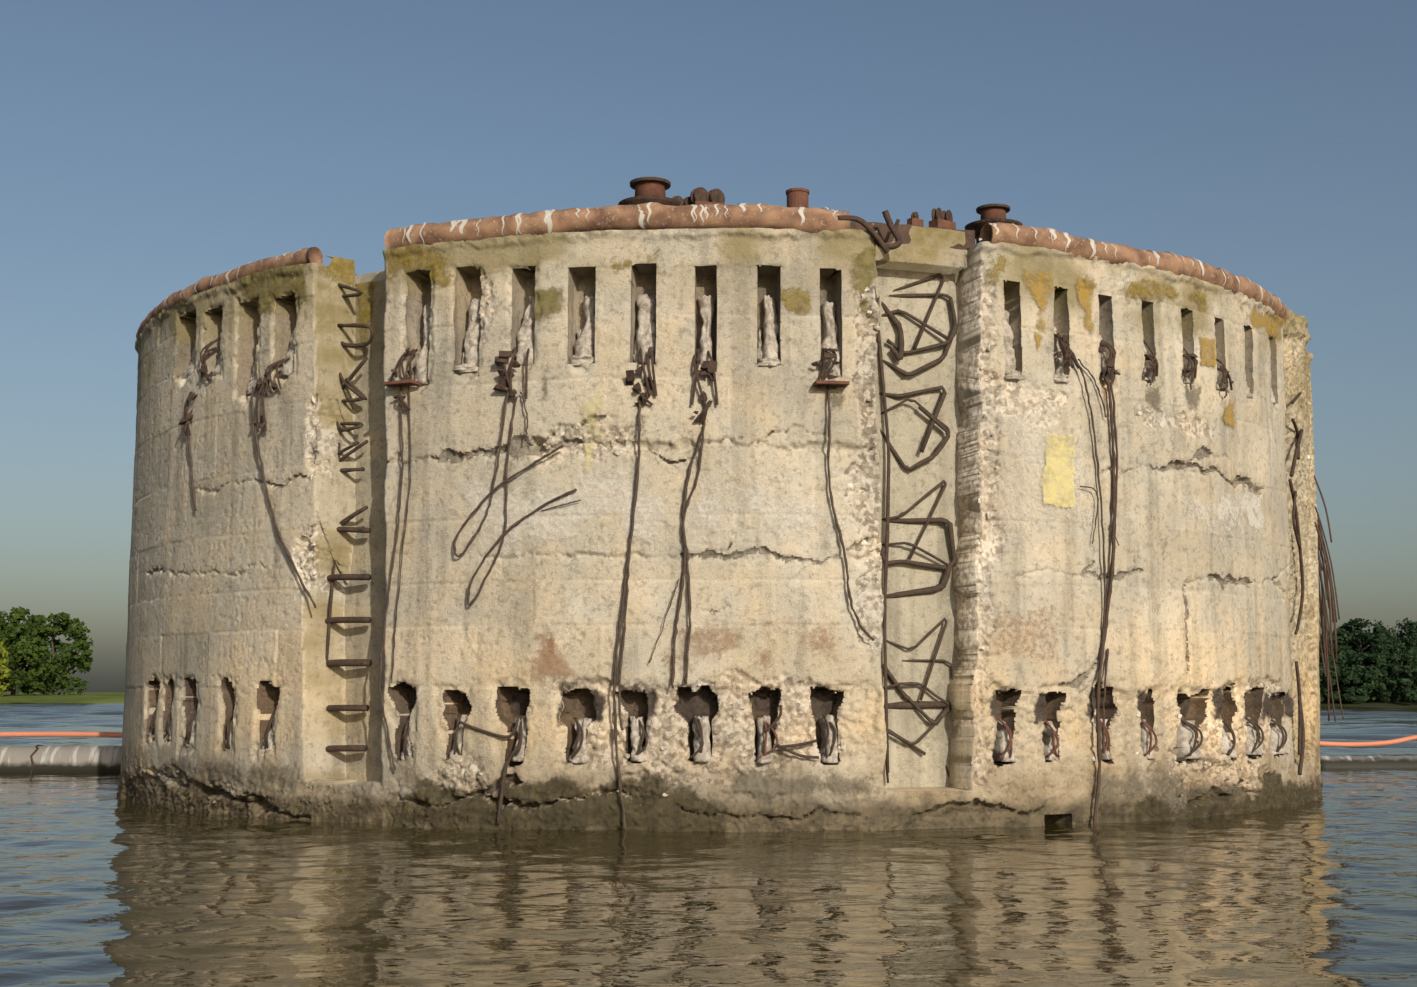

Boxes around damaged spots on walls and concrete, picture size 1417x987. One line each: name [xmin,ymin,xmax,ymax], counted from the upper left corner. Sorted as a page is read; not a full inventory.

crack [430,414,606,464]
crack [659,455,687,464]
spalling [841,286,884,651]
crack [1149,445,1264,512]
crack [680,537,869,565]
spalling [951,260,1069,786]
crack [1079,560,1143,582]
spalling [1092,332,1318,809]
spalling [423,714,523,824]
spalling [550,667,846,806]
damp [732,769,869,800]
damp [1089,761,1191,812]